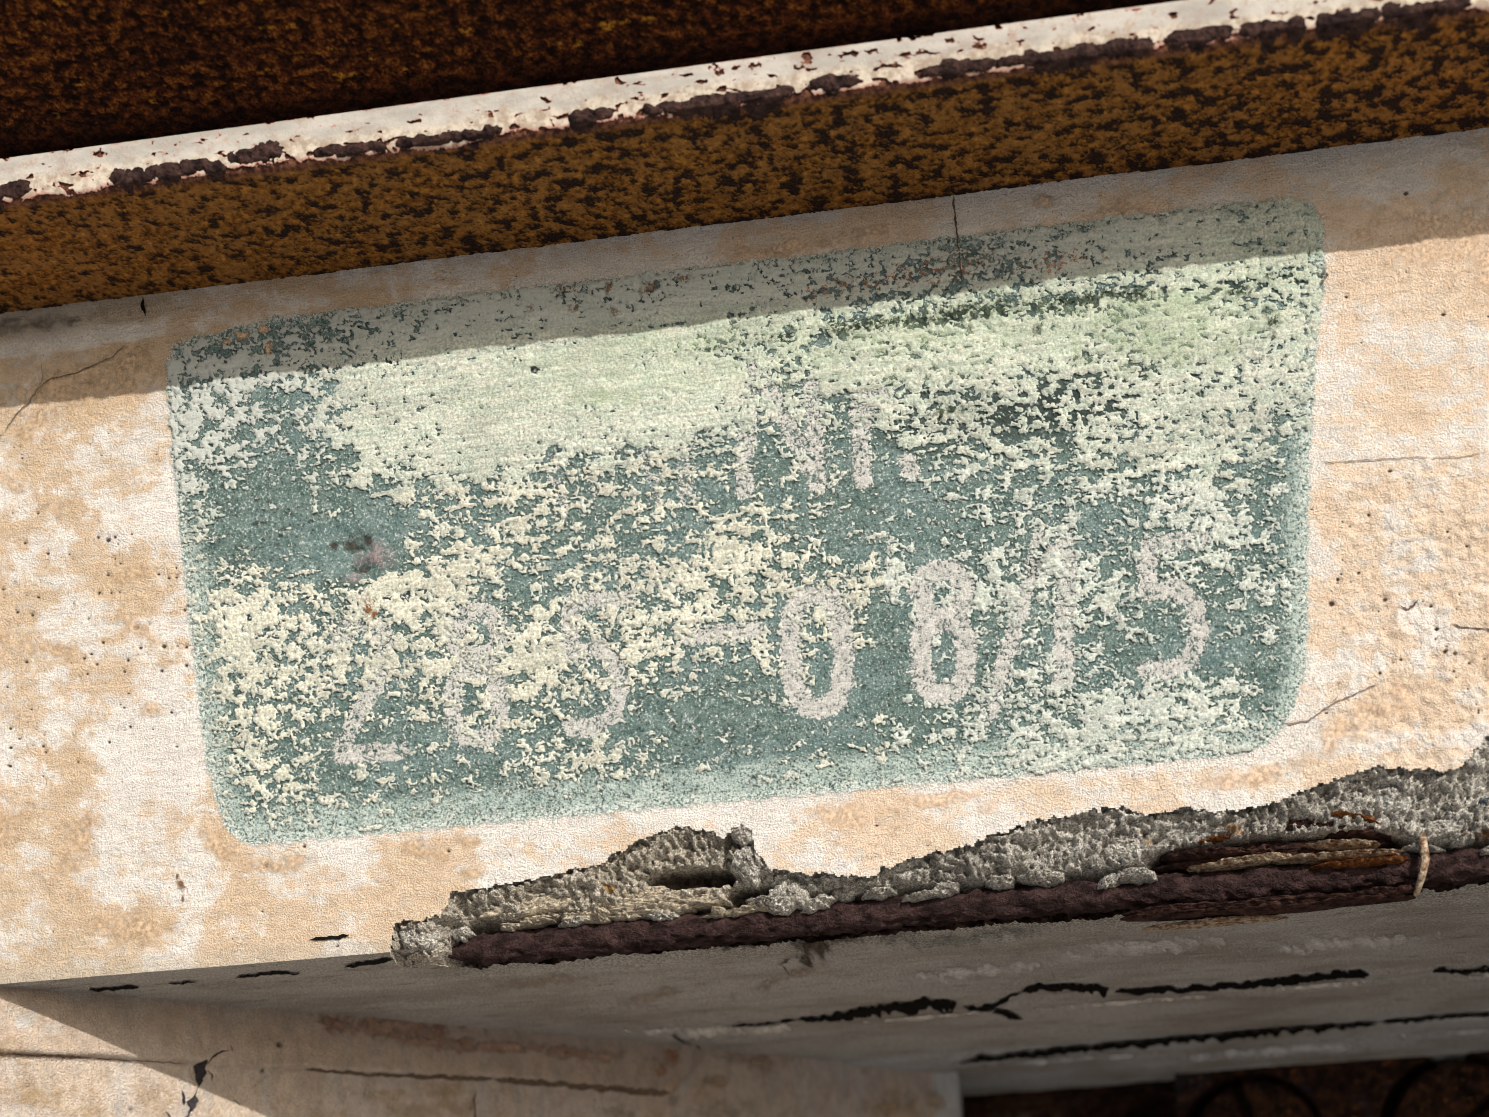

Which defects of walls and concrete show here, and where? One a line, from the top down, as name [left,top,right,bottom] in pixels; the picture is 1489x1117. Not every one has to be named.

rust [920,0,1473,82]
peeling [1464,0,1489,12]
peeling [0,0,1443,202]
peeling [165,197,1325,841]
peeling [250,856,302,872]
spalling [390,736,1489,970]
rust [782,937,861,973]
peeling [918,963,1038,980]
crack [1433,965,1489,976]
crack [668,969,1489,1064]
crack [0,1043,255,1117]
crack [304,1068,671,1117]